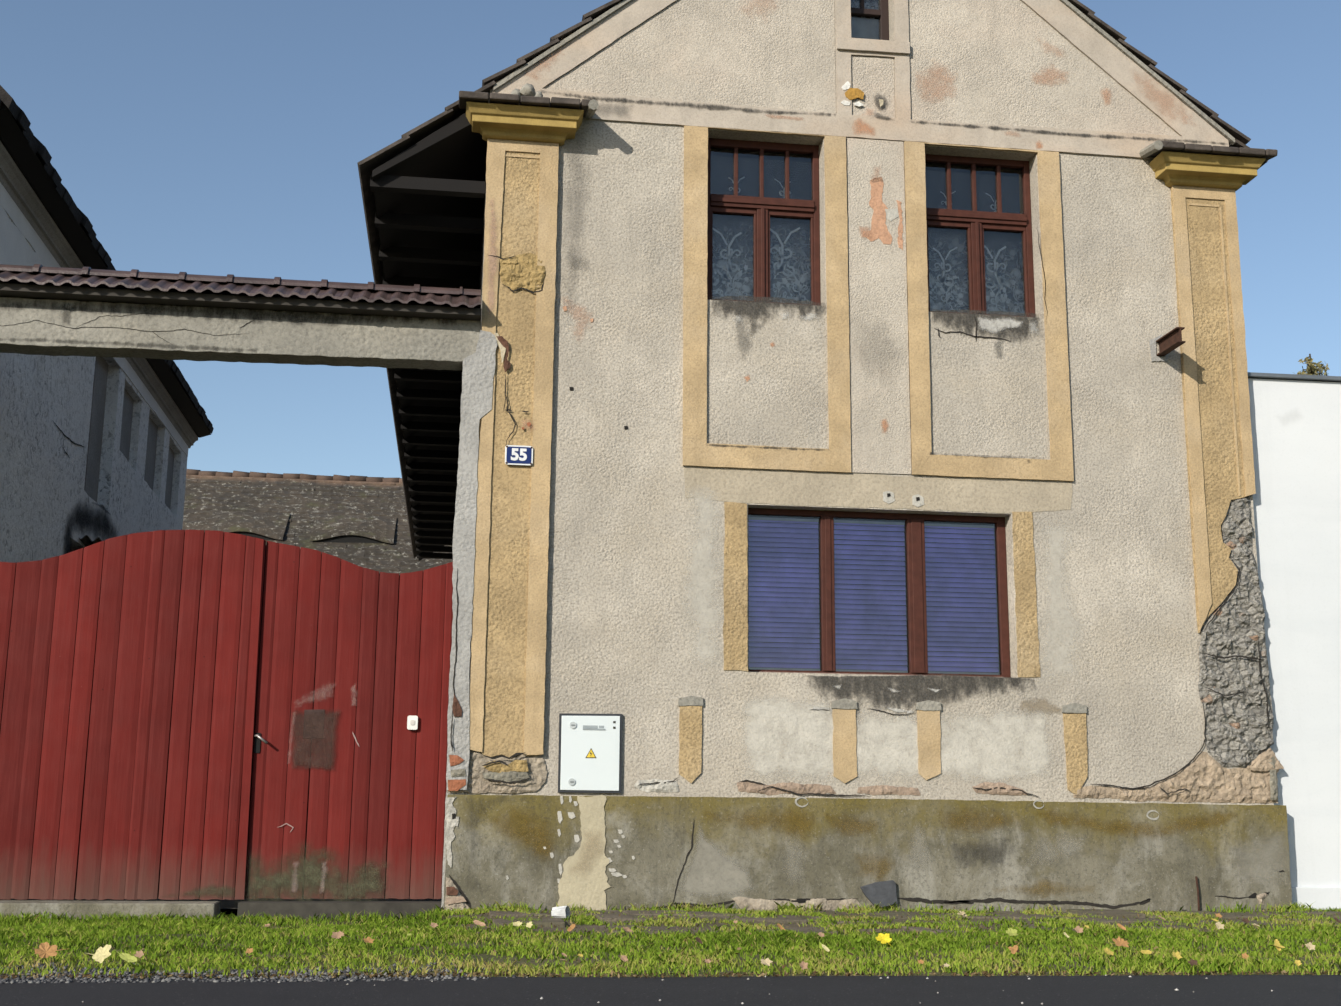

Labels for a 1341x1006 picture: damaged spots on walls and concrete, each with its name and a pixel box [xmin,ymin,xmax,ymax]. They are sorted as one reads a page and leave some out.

peeling [861,177,903,250]
damp [712,295,824,321]
damp [933,309,1037,339]
spalling [494,333,511,372]
spalling [1073,496,1284,804]
damp [810,674,1025,713]
spalling [445,695,547,911]
peeling [557,796,580,842]
peeling [608,829,635,878]
crack [649,823,861,911]
crack [898,897,1150,909]